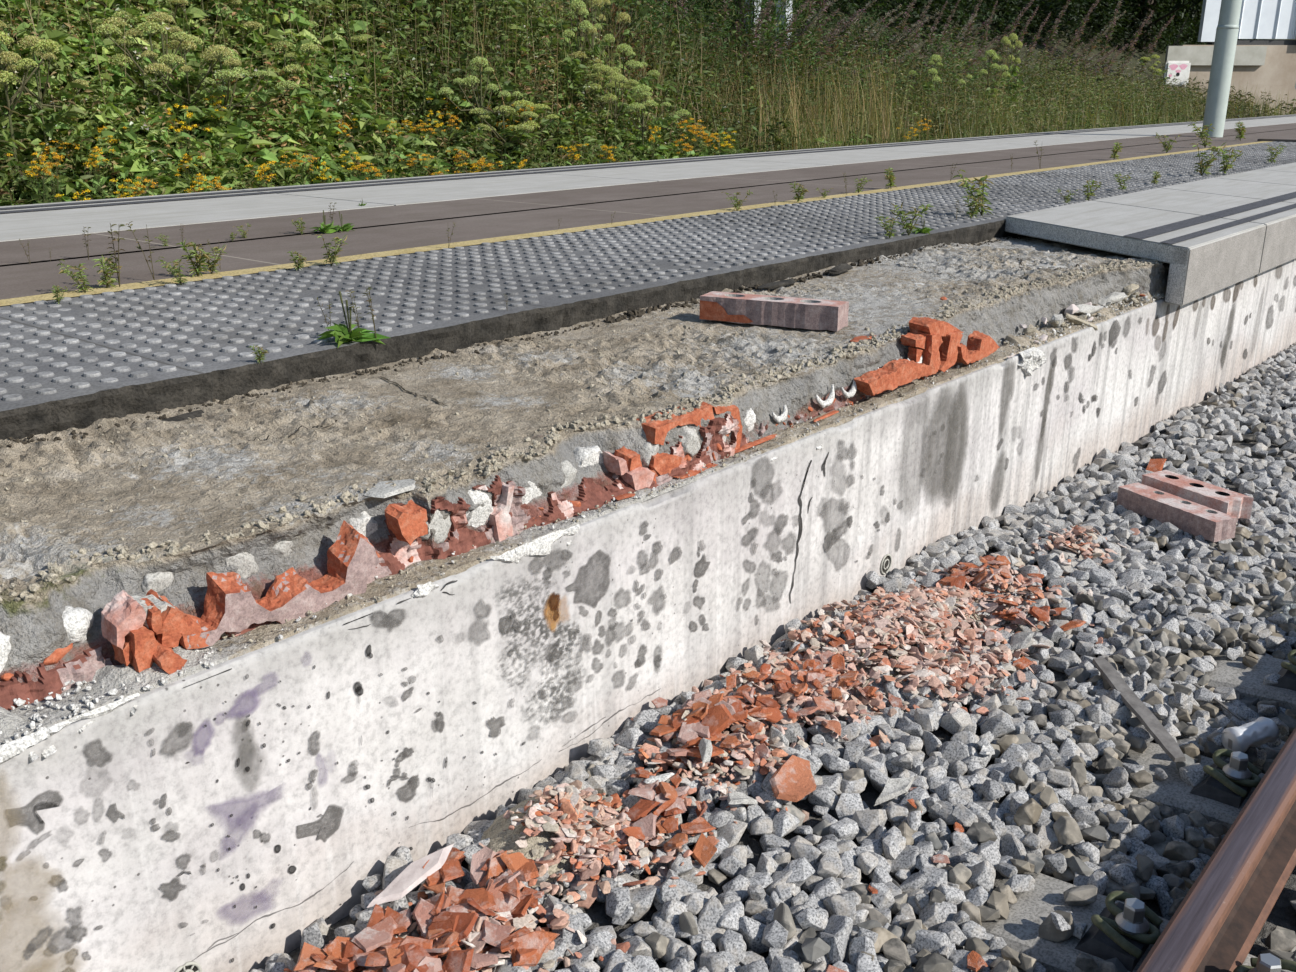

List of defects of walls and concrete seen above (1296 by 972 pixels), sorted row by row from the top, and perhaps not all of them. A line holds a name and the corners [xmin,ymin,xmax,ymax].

water stain [921,385,977,498]
crack [789,452,829,603]
corrosion [545,593,560,630]